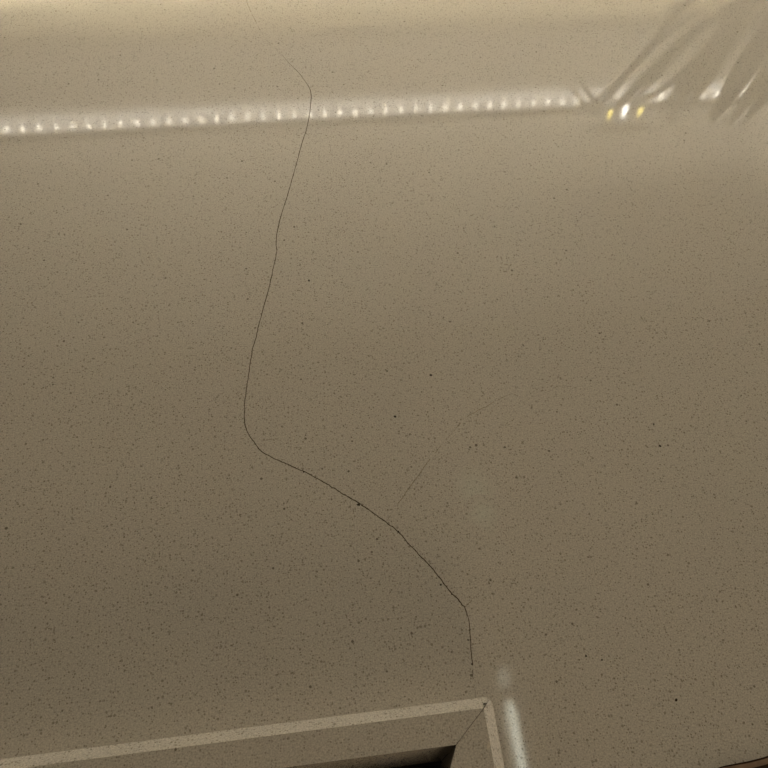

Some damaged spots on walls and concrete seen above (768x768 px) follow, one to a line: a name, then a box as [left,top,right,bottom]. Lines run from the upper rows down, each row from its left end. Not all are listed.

crack [244,54,476,697]